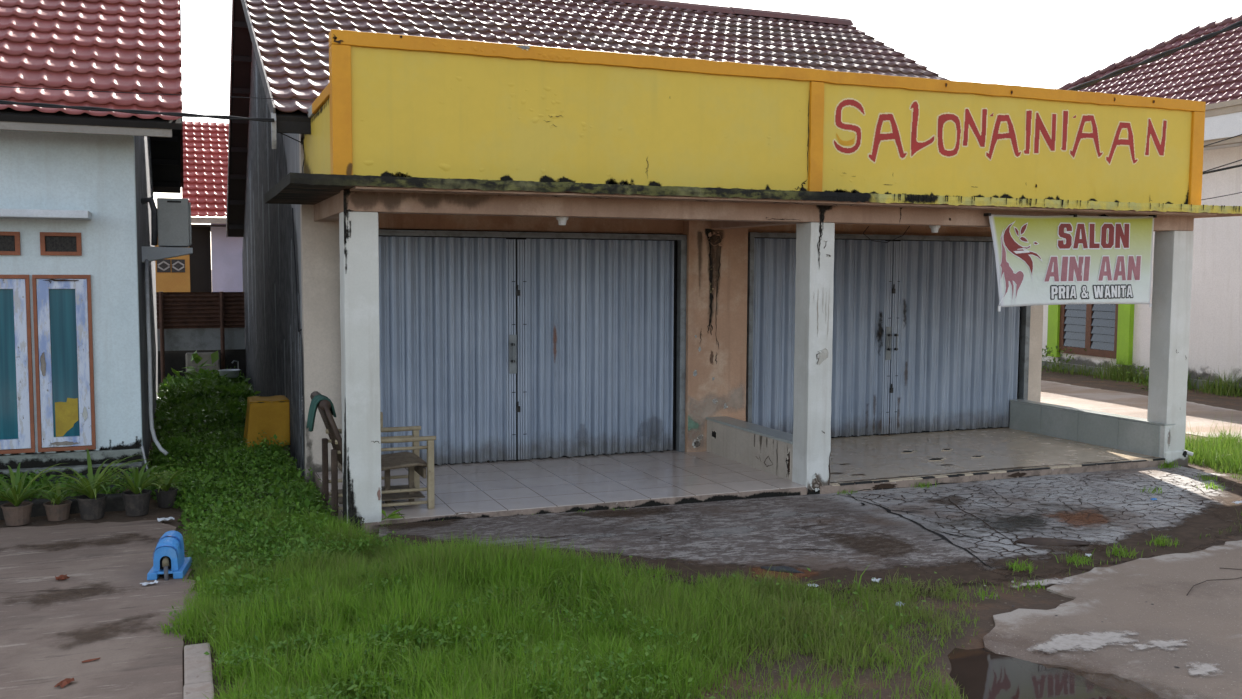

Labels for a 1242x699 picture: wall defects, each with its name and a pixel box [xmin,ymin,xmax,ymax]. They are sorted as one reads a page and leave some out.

damp [540,175,576,183]
crack [769,105,830,268]
damp [698,229,723,292]